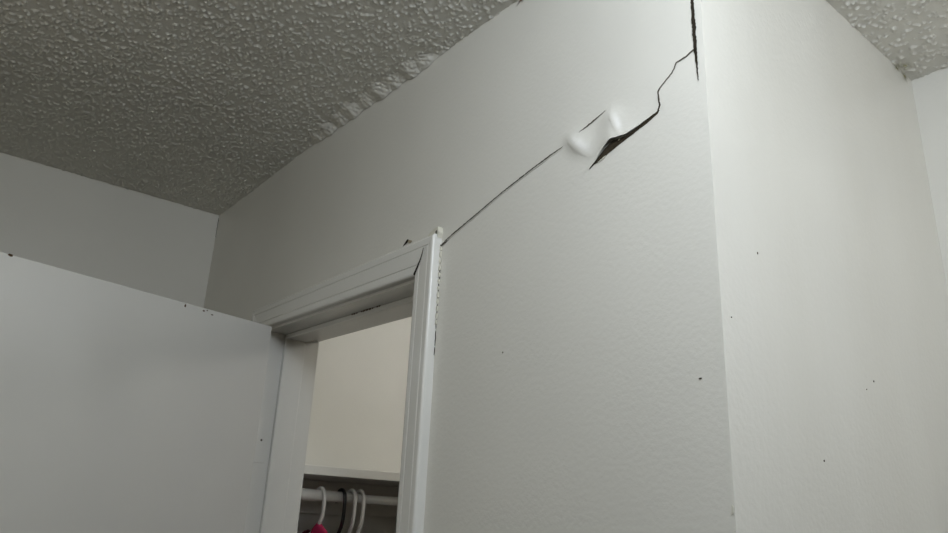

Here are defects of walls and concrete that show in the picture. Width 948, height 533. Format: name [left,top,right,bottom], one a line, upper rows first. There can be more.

crack [589,0,699,169]
crack [413,146,564,276]